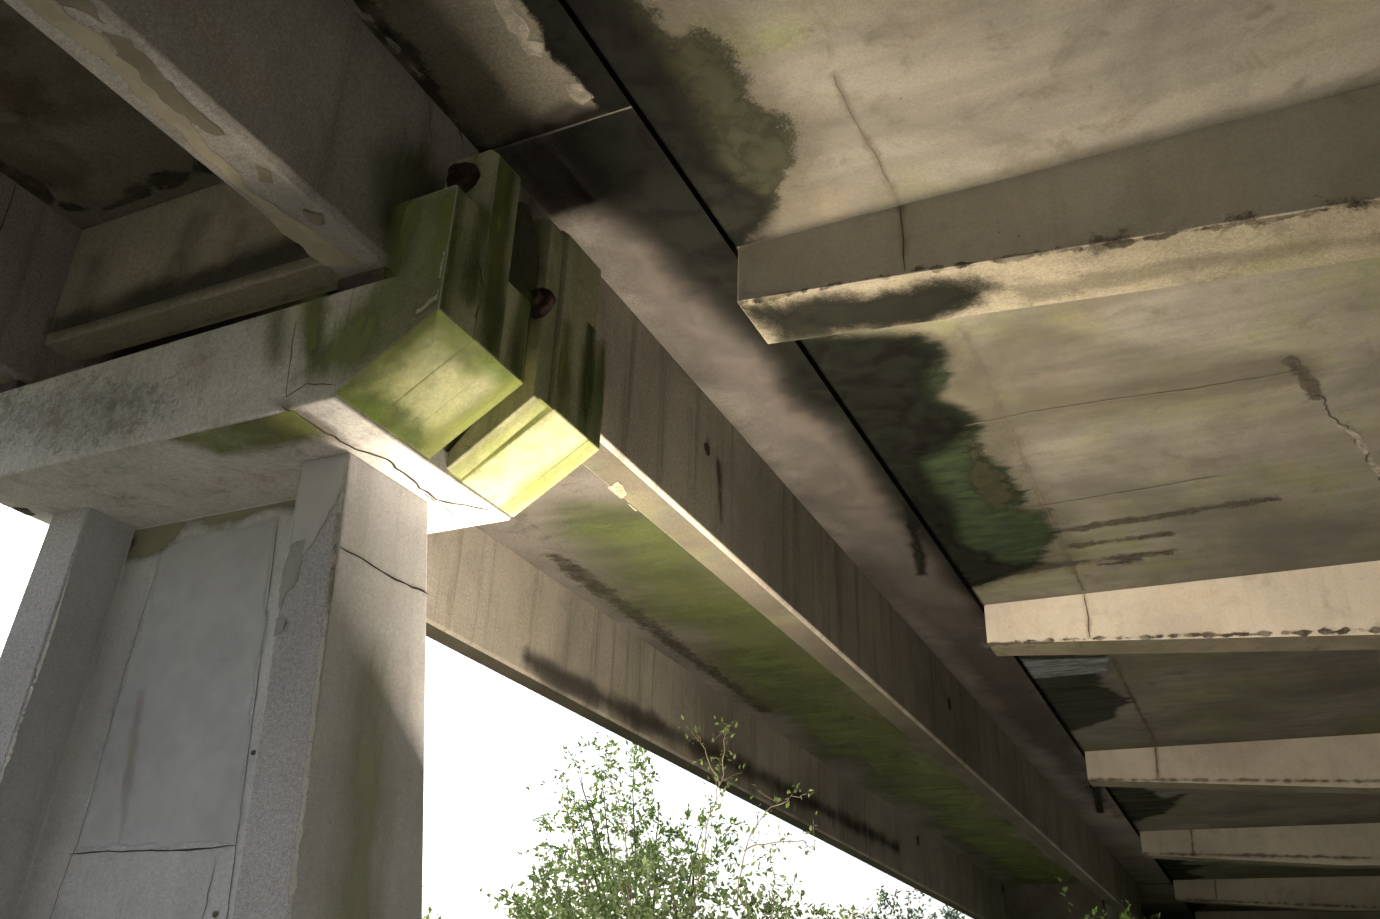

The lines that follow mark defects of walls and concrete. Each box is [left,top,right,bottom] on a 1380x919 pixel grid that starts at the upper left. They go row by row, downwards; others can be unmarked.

leakage [0,161,214,211]
peeling [23,0,358,266]
crack [833,76,905,271]
spalling [912,262,974,271]
spalling [991,199,1380,263]
crack [280,323,488,523]
leakage [344,0,1282,822]
crack [966,356,1380,481]
crack [340,547,429,595]
spalling [1092,632,1272,640]
spalling [1292,627,1350,637]
leakage [524,653,899,852]